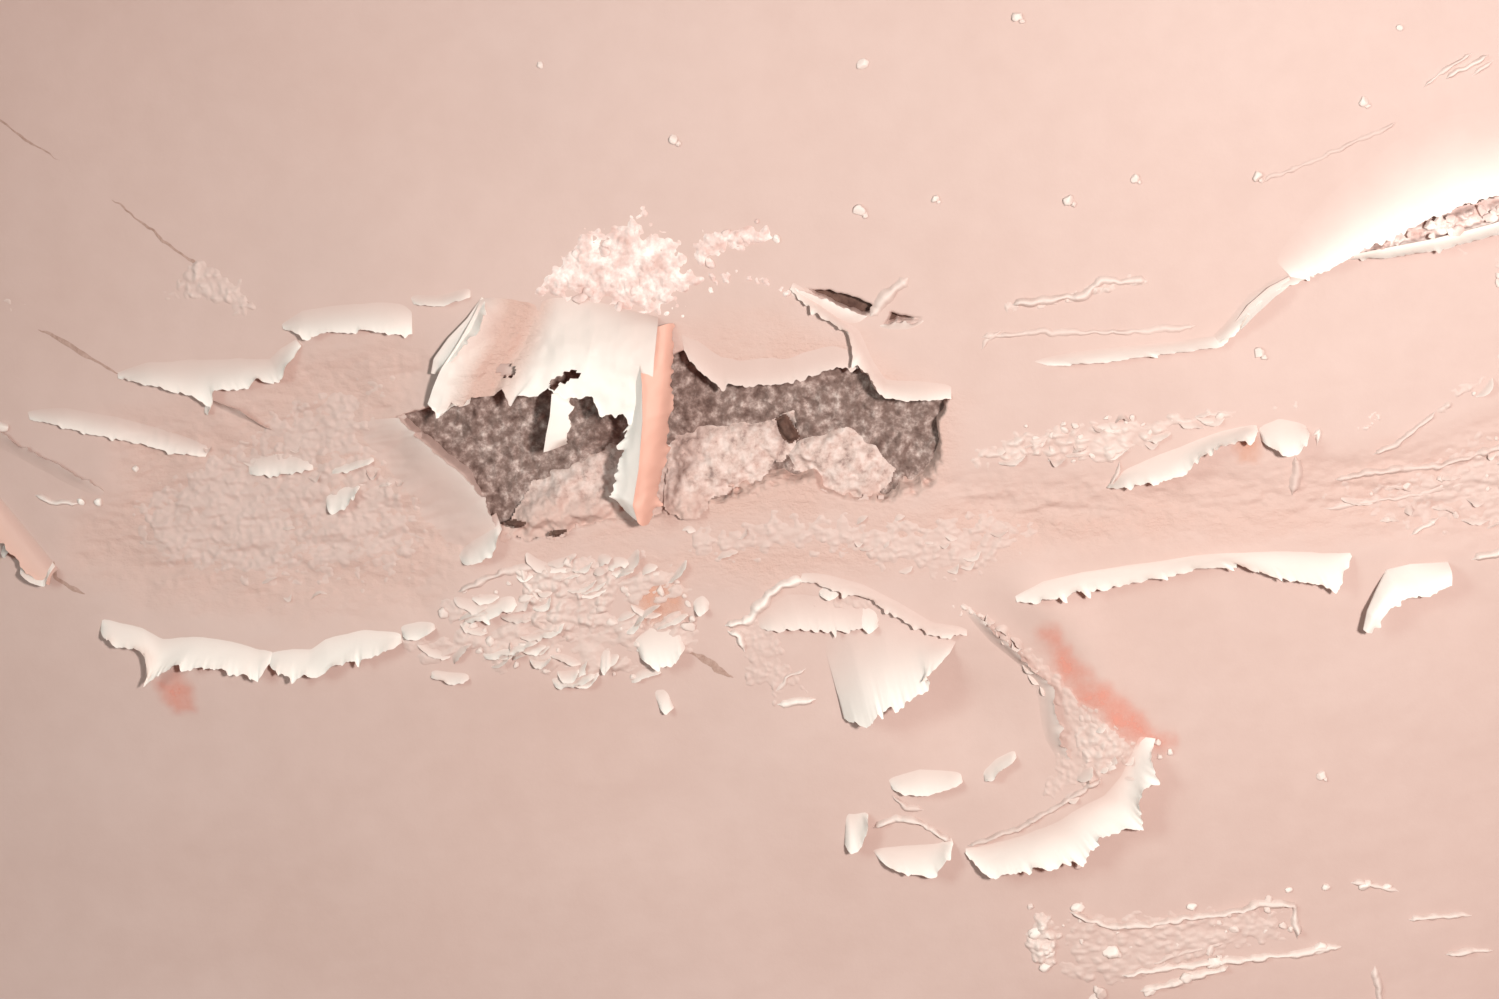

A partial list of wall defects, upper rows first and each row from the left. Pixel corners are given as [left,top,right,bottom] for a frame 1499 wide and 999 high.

peeling [1004,274,1148,313]
peeling [0,421,105,506]
peeling [0,498,85,594]
spalling [28,283,1195,879]
peeling [1015,551,1352,604]